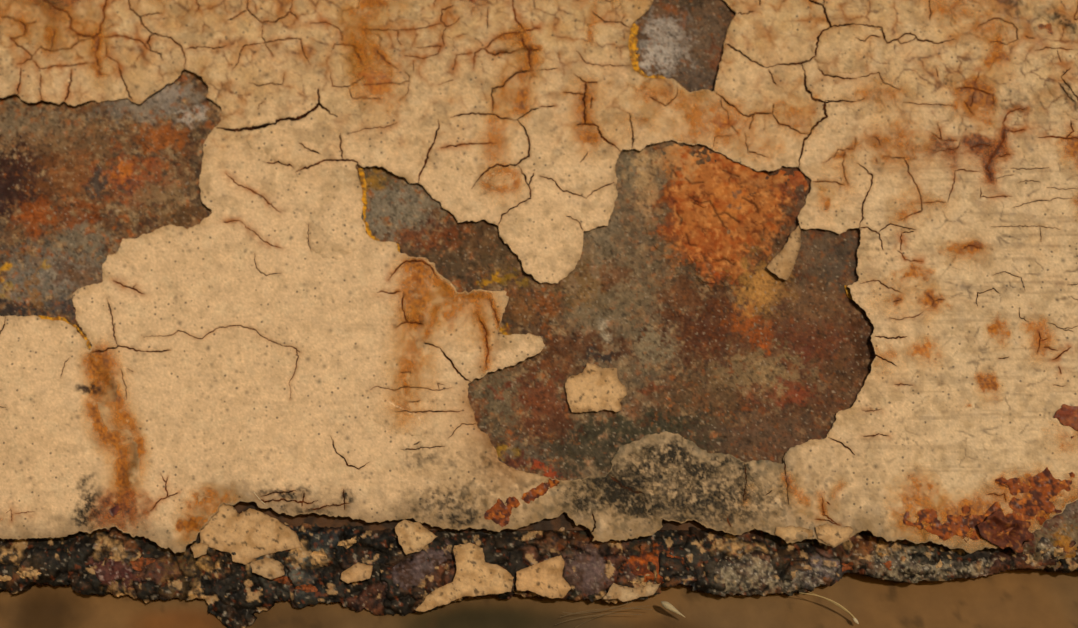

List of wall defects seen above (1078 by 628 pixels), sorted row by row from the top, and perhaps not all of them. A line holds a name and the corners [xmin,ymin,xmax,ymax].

crack [0,0,634,229]
corrosion [346,0,393,101]
peeling [628,0,736,92]
crack [714,0,1078,262]
peeling [0,69,222,349]
corrosion [402,258,500,393]
peeling [355,140,876,481]
crack [864,280,944,385]
corrosion [912,340,932,358]
crack [976,271,1077,387]
corrosion [0,345,1078,628]
crack [828,409,887,455]